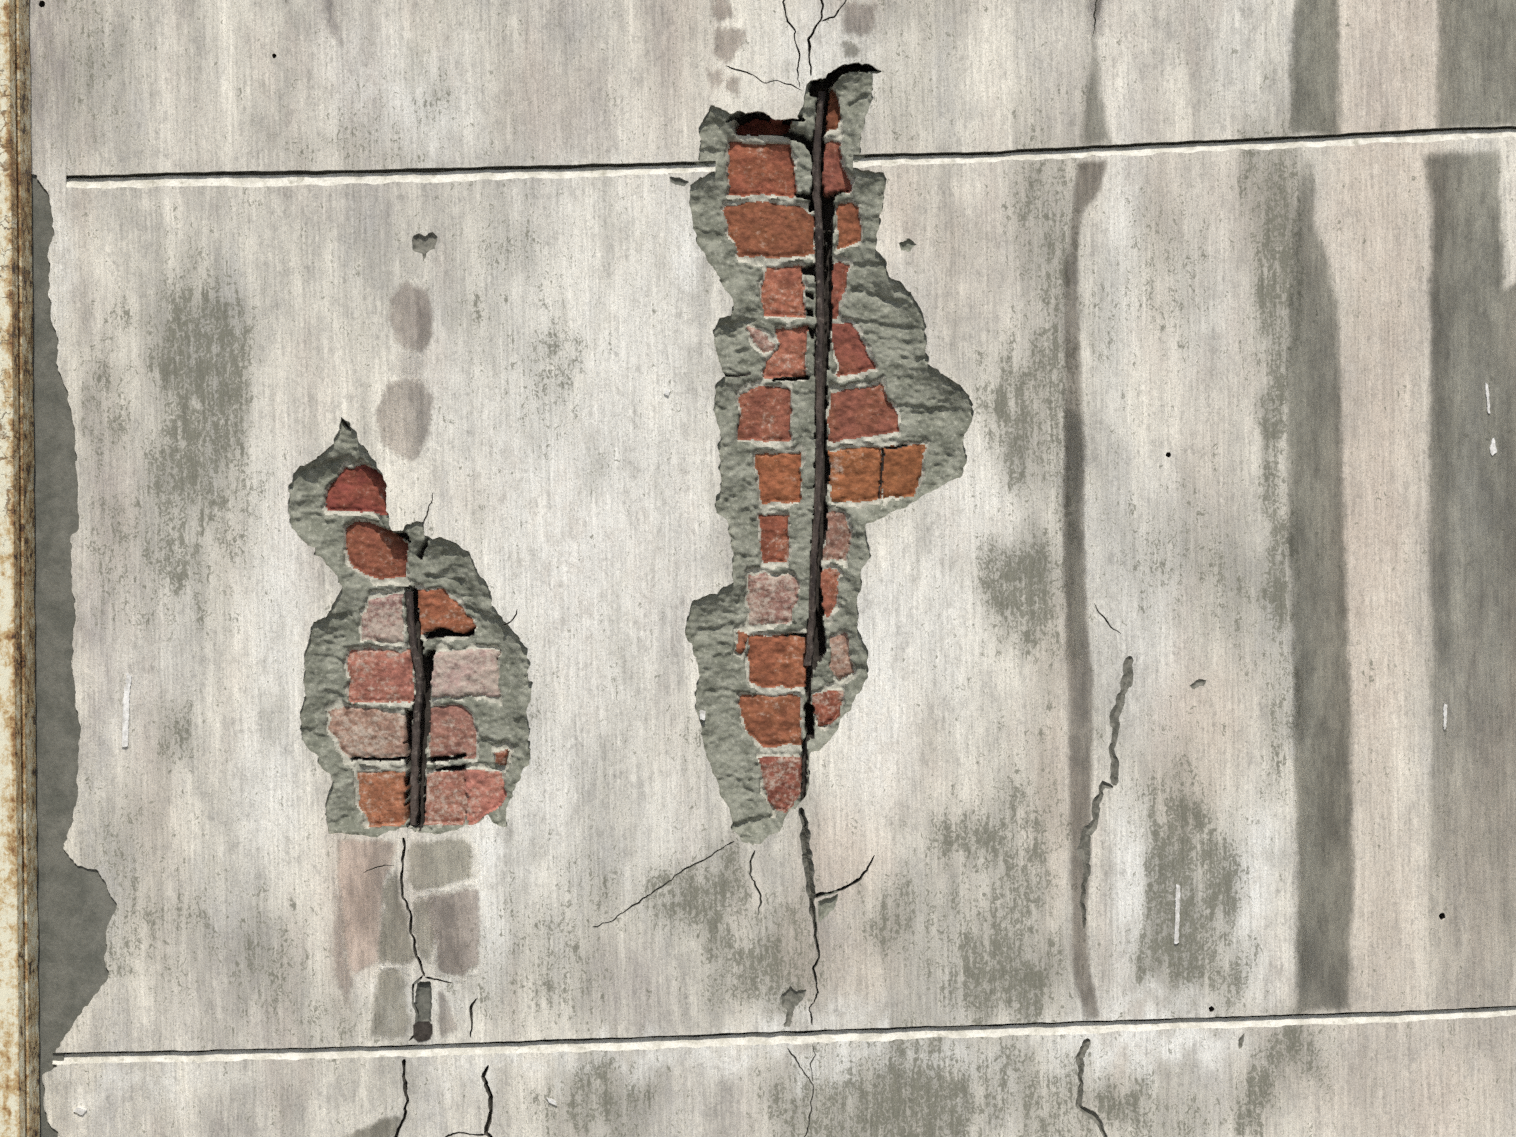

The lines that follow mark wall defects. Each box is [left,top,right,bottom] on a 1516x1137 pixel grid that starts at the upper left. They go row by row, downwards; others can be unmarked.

crack [727,0,847,91]
water stain [1290,0,1339,134]
water stain [1438,0,1516,126]
flaking render [31,174,117,1137]
spalling [289,417,533,838]
crack [364,838,493,1137]
crack [592,841,762,928]
spalling [668,64,974,845]
crack [788,807,875,1137]
crack [1077,605,1134,929]
water stain [1288,181,1352,1010]
water stain [1427,153,1516,621]